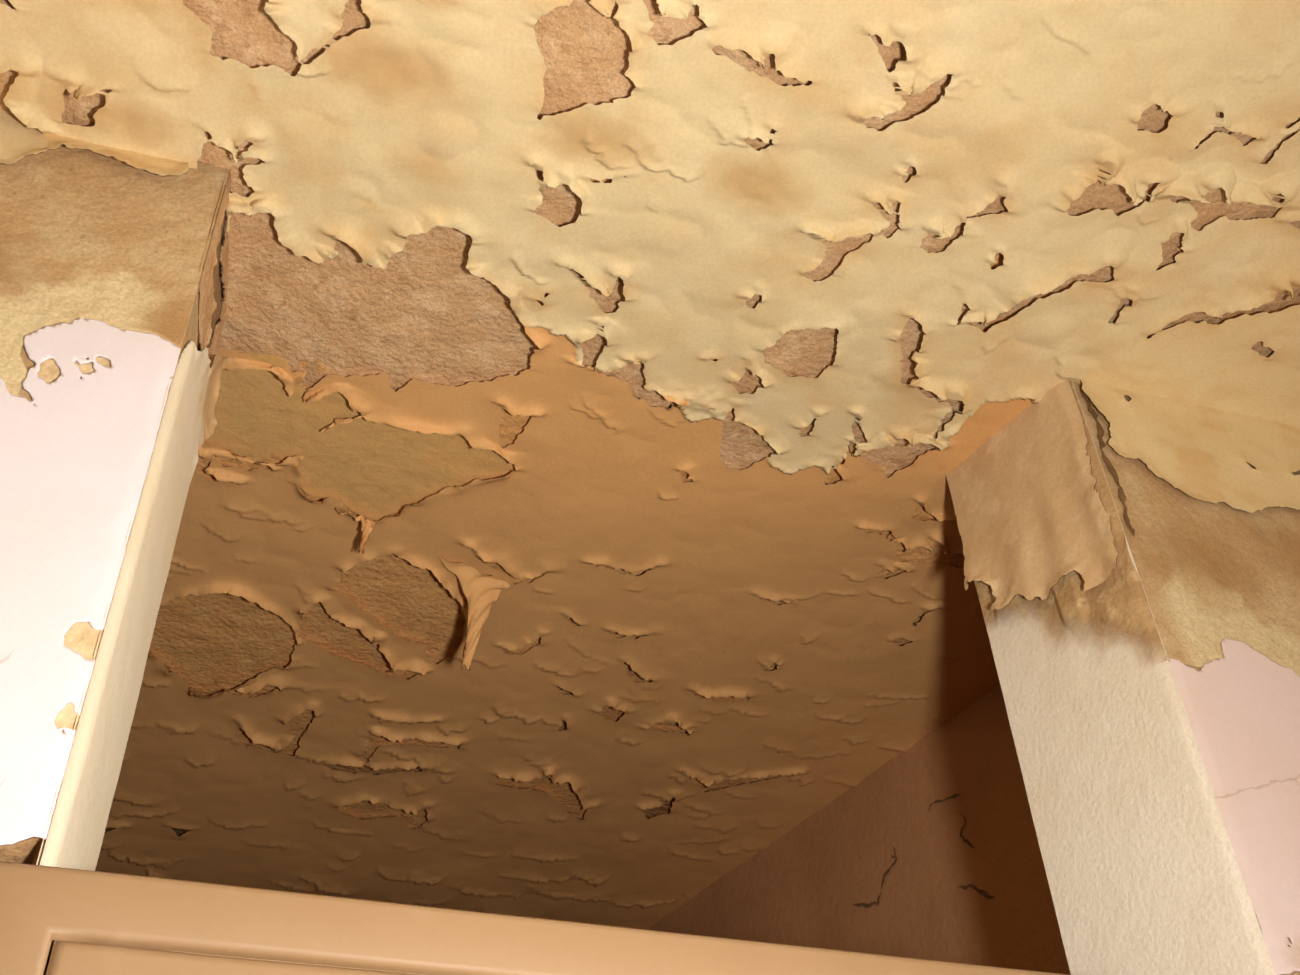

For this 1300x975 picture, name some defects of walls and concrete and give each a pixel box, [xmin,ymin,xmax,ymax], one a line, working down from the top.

spalling [183,0,400,77]
spalling [517,0,730,120]
spalling [831,0,983,131]
spalling [1114,82,1274,142]
spalling [789,148,1026,282]
spalling [1041,136,1300,269]
spalling [892,301,978,415]
spalling [0,43,945,871]
peeling [897,378,1300,676]
crack [853,848,897,908]
crack [928,793,974,848]
crack [958,884,995,899]